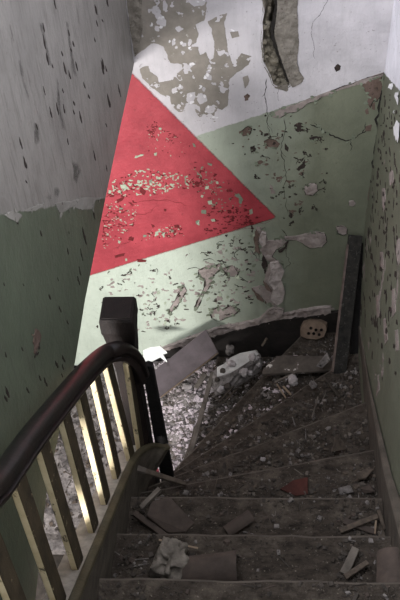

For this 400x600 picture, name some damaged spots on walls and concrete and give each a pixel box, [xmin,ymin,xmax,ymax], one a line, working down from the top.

flaking render [127,0,251,122]
crack [263,79,288,211]
flaking render [261,0,304,92]
crack [310,77,382,165]
peeling [5,202,45,224]
flaking render [55,72,400,397]